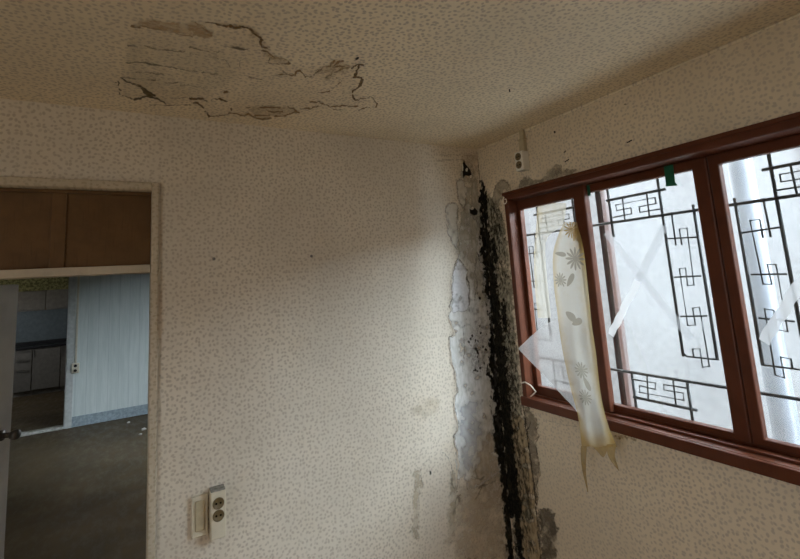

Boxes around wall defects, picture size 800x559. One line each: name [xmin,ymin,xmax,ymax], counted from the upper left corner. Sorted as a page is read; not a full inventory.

peeling [452,259,478,313]
damp [445,179,559,559]